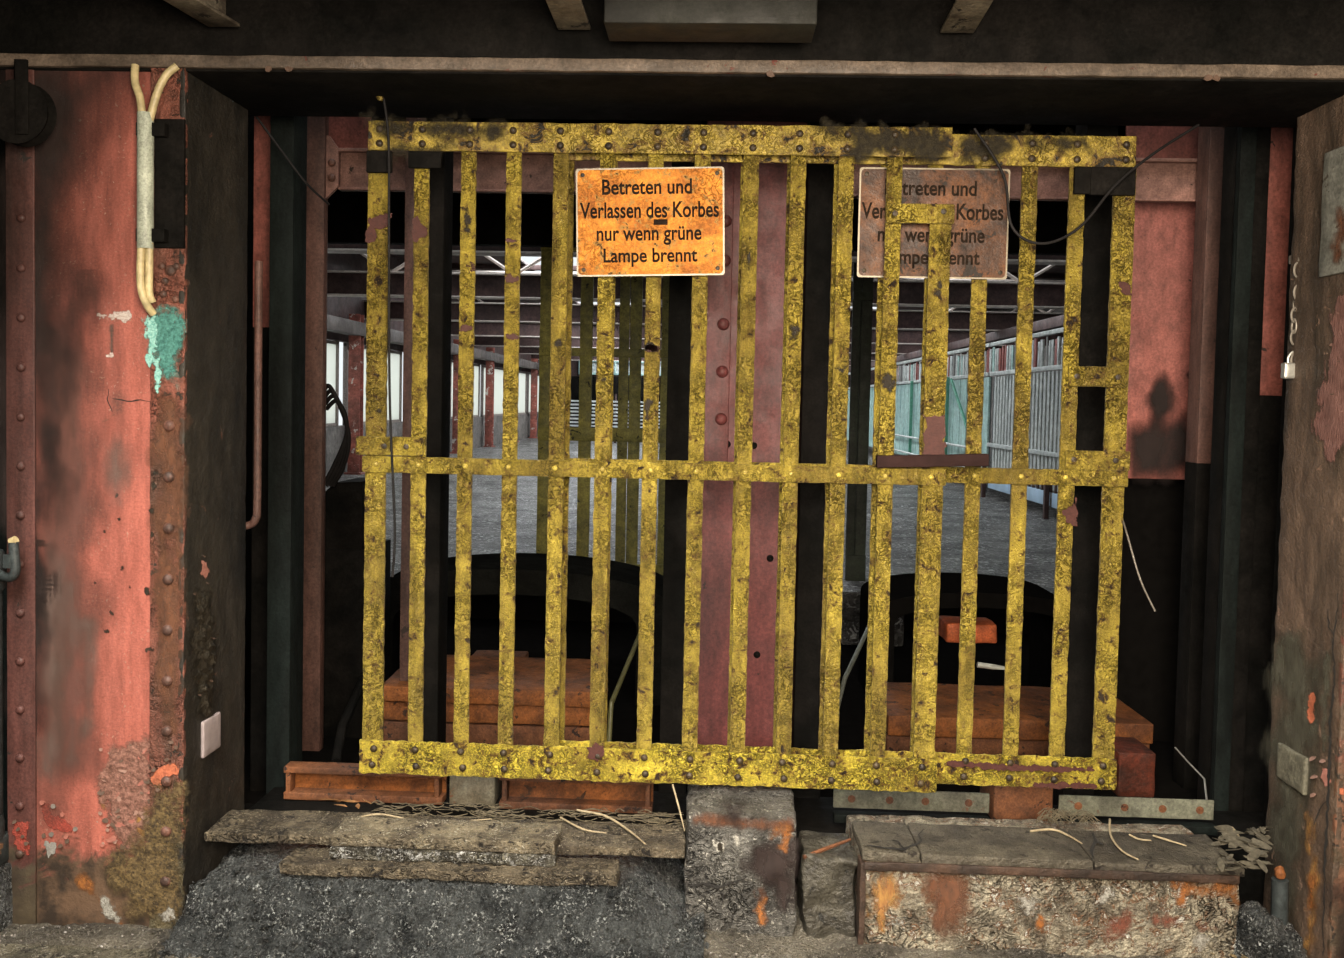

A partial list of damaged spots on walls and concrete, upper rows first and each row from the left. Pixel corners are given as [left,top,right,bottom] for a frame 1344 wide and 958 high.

rust [1331,208,1344,263]
rust [1307,692,1316,724]
peeling [97,737,179,850]
peeling [1309,756,1344,797]
rust [75,781,188,922]
rust [775,826,791,852]
rust [756,895,767,925]
rust [874,875,897,932]
rust [923,873,967,933]
rust [1284,814,1319,948]